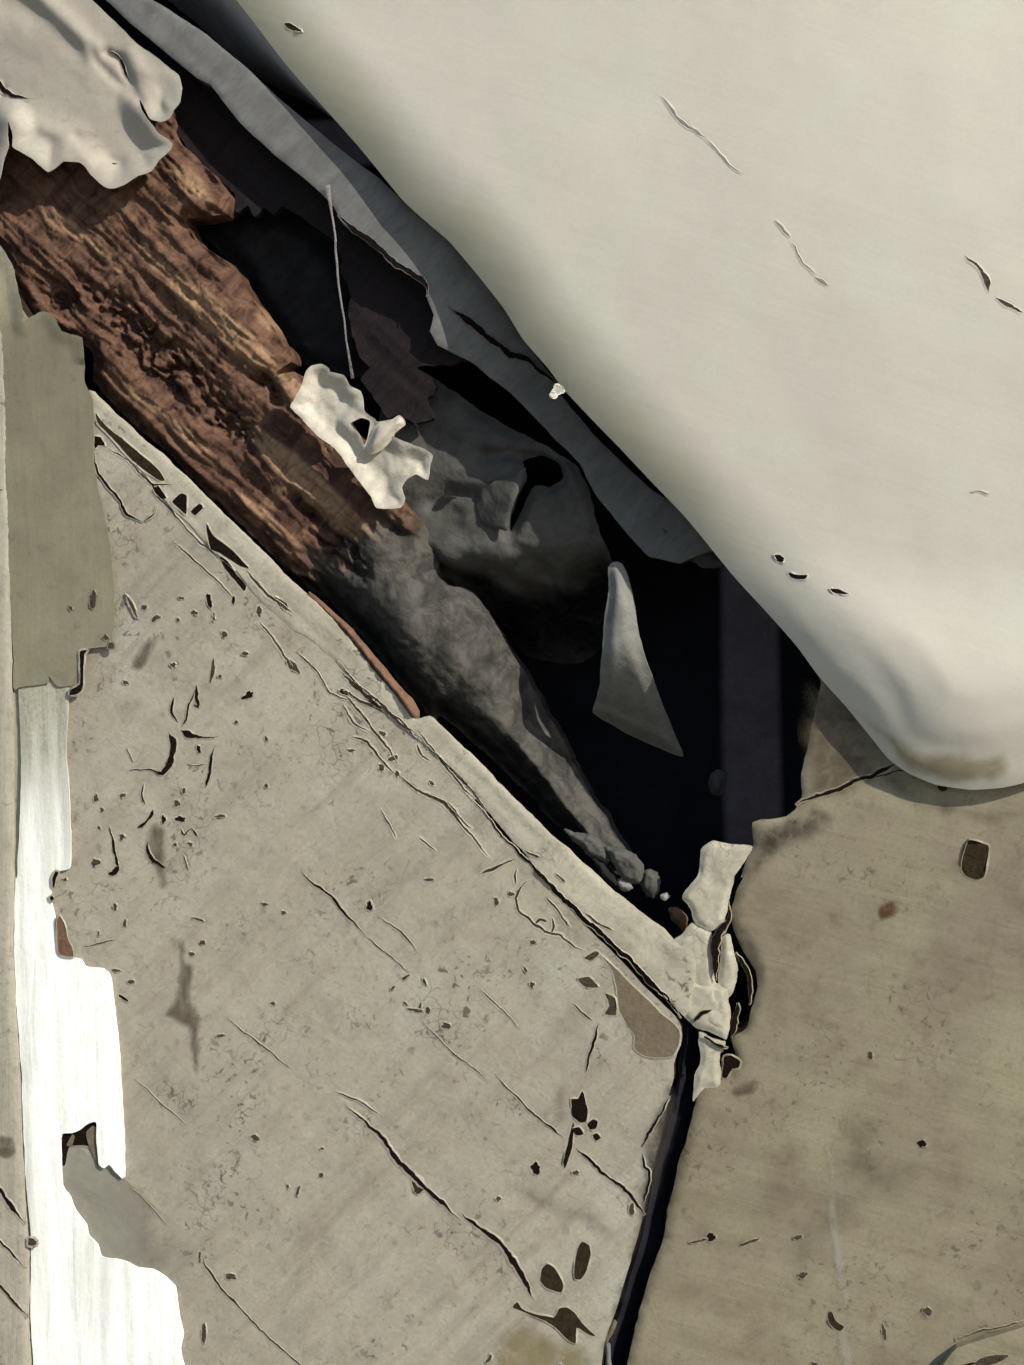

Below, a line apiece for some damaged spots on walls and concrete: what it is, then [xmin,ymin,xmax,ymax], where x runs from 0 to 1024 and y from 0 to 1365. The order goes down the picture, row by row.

spalling [153,0,225,50]
peeling [0,0,198,189]
spalling [252,72,406,204]
crack [660,95,743,175]
crack [774,219,830,287]
crack [964,254,1024,315]
spalling [0,246,821,1142]
leakage [168,966,198,1058]
spalling [62,1122,162,1272]
crack [334,1090,536,1301]
spalling [612,1176,655,1322]
crack [955,1319,1024,1365]